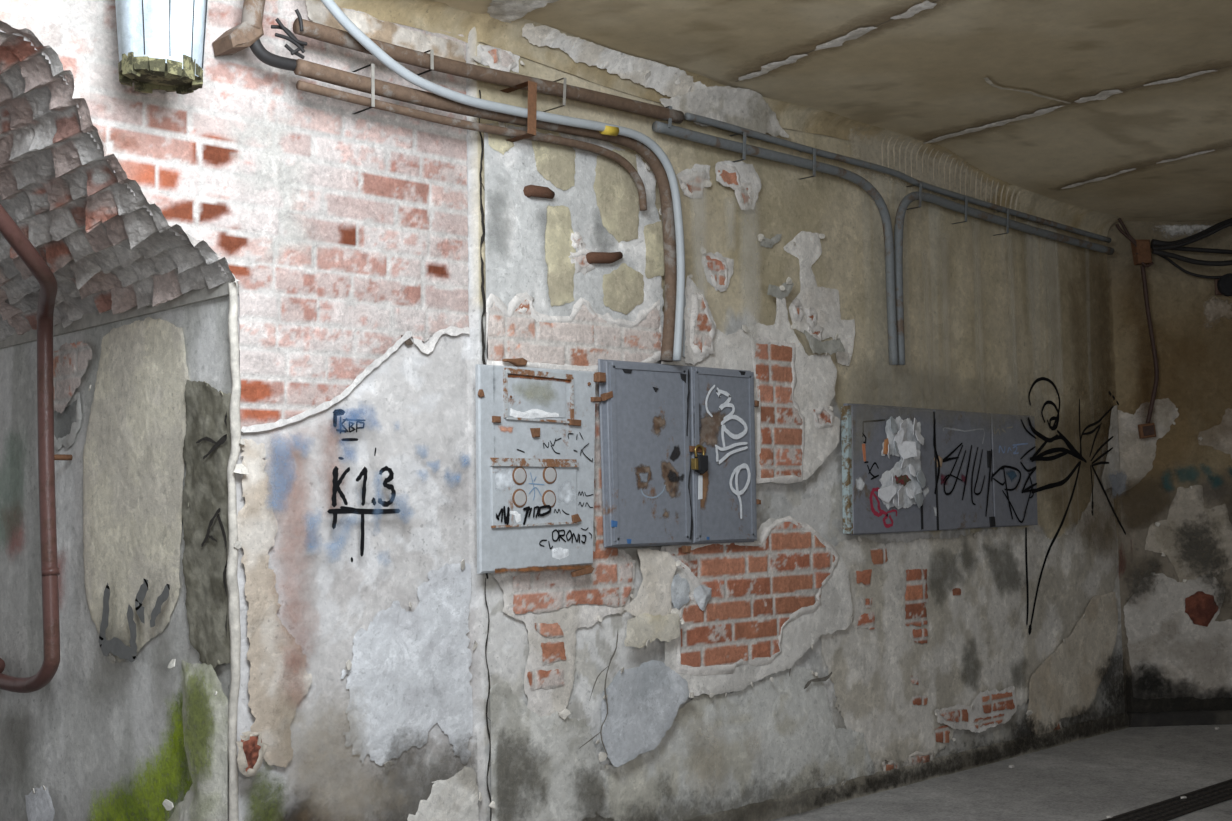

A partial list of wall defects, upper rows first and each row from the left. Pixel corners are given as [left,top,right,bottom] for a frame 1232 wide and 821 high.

flaking render [343,8,524,73]
crack [478,90,486,365]
flaking render [0,0,470,777]
flaking render [341,122,1232,821]
leakage [275,797,330,821]
leakage [378,740,474,821]
crack [484,573,492,821]
leakage [497,739,546,821]
leakage [628,654,1232,821]